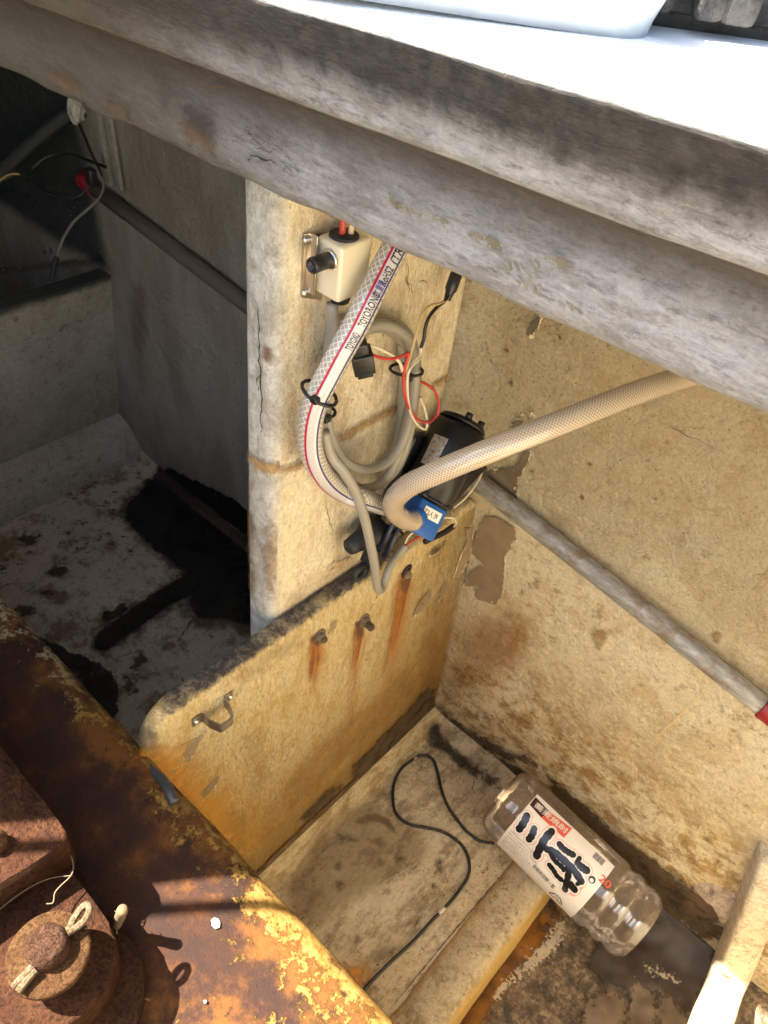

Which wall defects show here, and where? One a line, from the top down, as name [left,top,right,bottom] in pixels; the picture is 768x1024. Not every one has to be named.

crack [255,311,263,433]
peeling [487,450,531,499]
peeling [414,516,517,617]
corrosion [310,636,320,674]
corrosion [353,622,363,658]
corrosion [392,576,411,649]
corrosion [146,749,258,852]
damp [428,706,724,943]
corrosion [345,963,370,988]